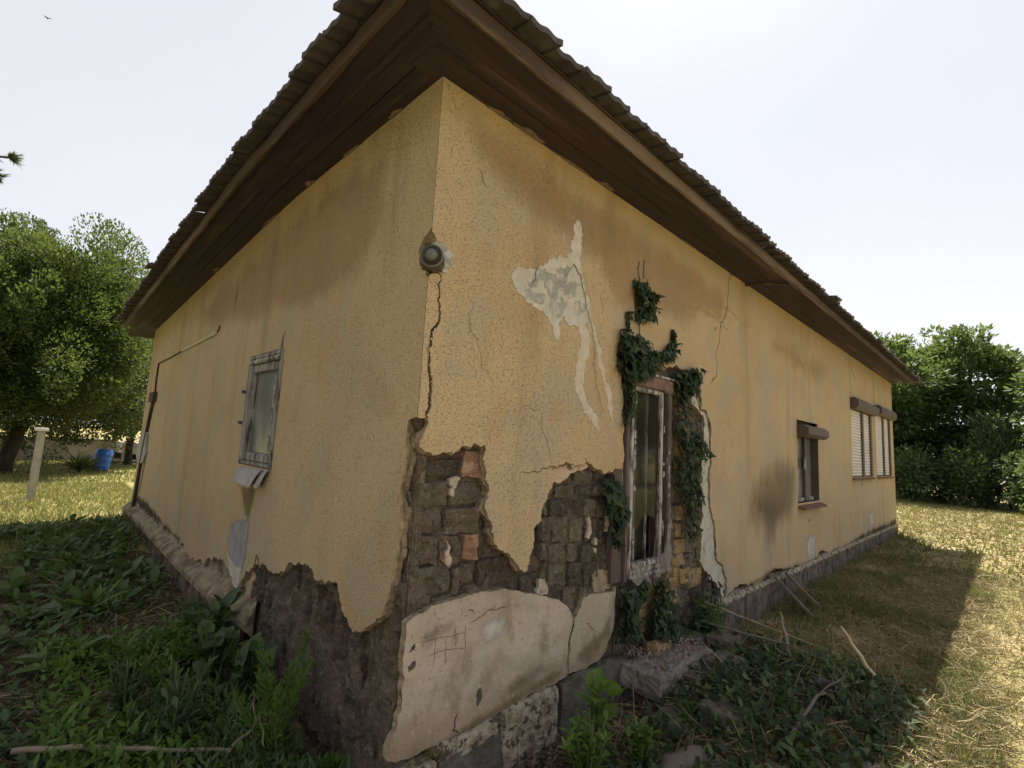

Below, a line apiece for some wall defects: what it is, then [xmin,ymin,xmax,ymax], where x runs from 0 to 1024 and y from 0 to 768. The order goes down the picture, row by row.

peeling [520,264,586,319]
crack [422,273,443,427]
crack [519,405,587,474]
spalling [209,368,725,768]
crack [567,620,593,676]